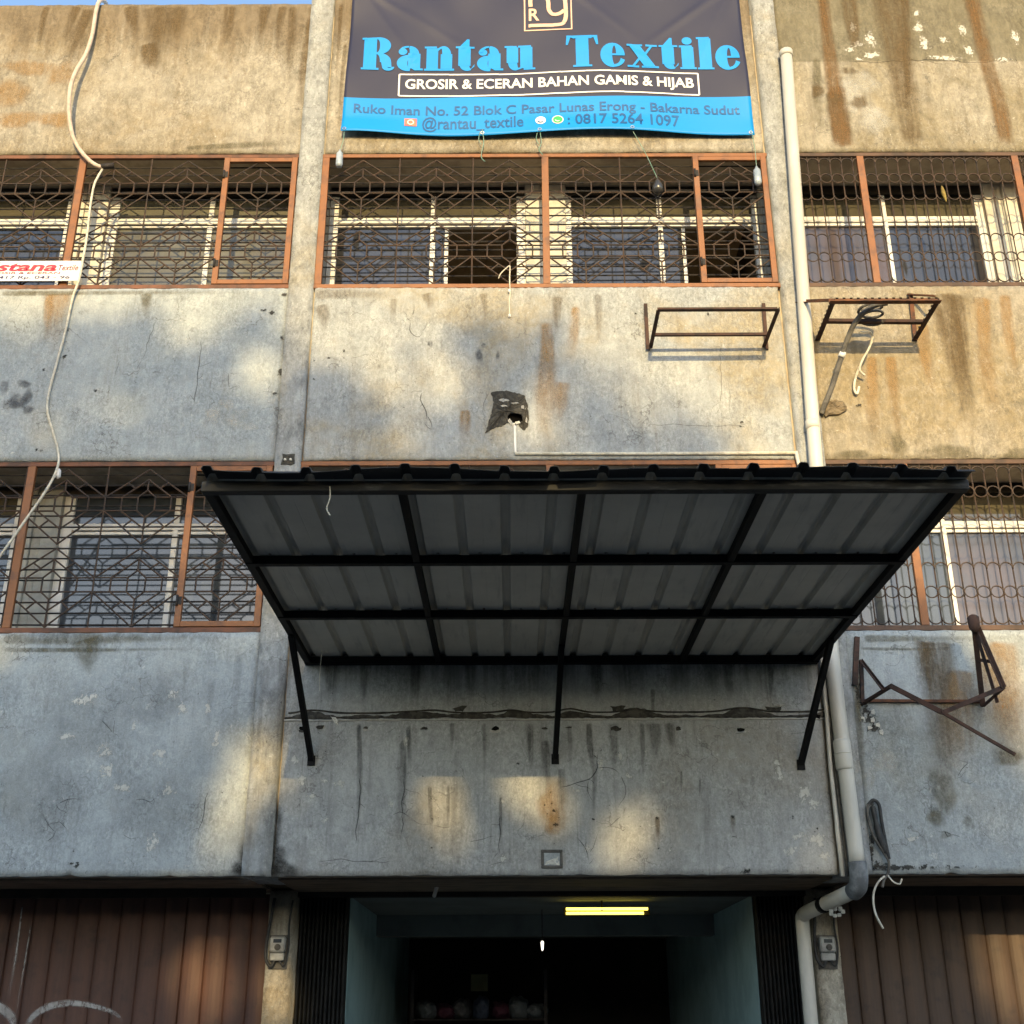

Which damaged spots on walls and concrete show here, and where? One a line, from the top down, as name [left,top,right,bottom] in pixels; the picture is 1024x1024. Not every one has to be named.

damp [71,7,92,39]
damp [126,6,137,26]
damp [142,6,184,64]
damp [260,7,310,75]
corrosion [819,0,850,145]
peeling [845,22,880,60]
peeling [913,10,973,61]
corrosion [966,0,1010,140]
corrosion [918,641,970,732]
corrosion [983,643,1016,721]
crack [328,780,447,863]
crack [565,756,626,862]